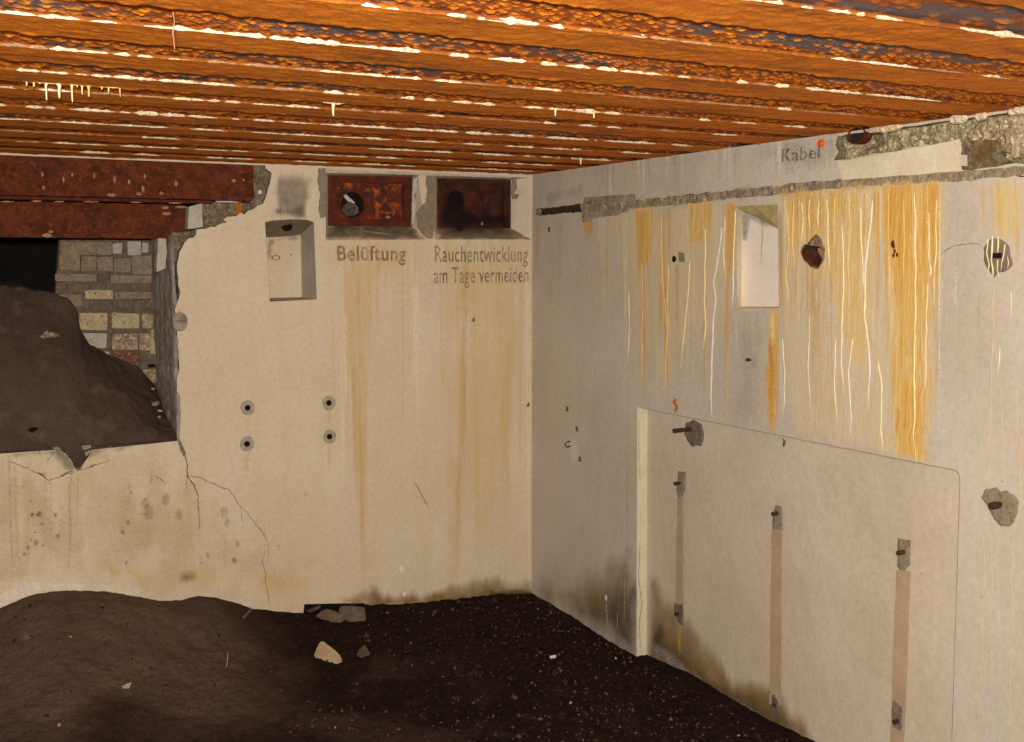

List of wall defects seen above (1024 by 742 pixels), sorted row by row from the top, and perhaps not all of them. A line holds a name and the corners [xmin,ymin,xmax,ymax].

water stain [17,68,361,96]
water stain [91,92,320,109]
water stain [337,96,437,114]
spalling [844,115,1024,170]
spalling [154,163,270,272]
spalling [803,234,825,269]
corrosion [583,192,736,413]
corrosion [763,177,951,465]
water stain [329,238,532,601]
crack [9,448,109,481]
crack [150,441,269,603]
water stain [581,590,636,655]